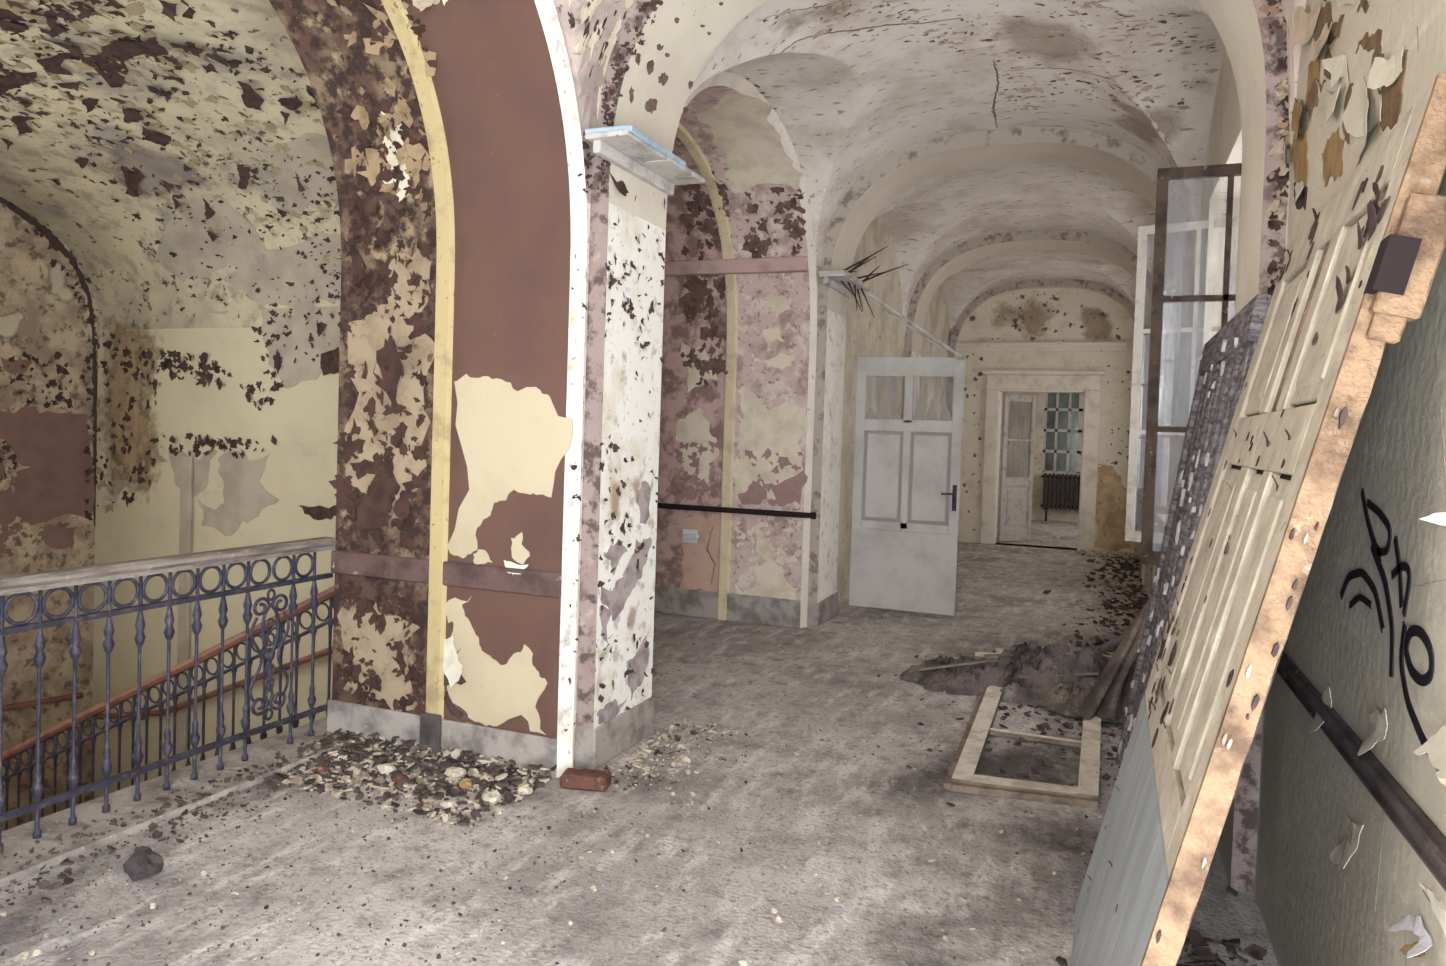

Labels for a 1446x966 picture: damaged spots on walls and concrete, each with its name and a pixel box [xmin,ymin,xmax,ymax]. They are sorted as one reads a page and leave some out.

peeling [0,0,448,559]
peeling [568,0,670,202]
flaking render [604,78,806,394]
peeling [1259,0,1408,296]
peeling [1335,266,1362,314]
flaking render [447,374,577,574]
peeling [593,435,656,739]
flaking render [650,386,808,600]